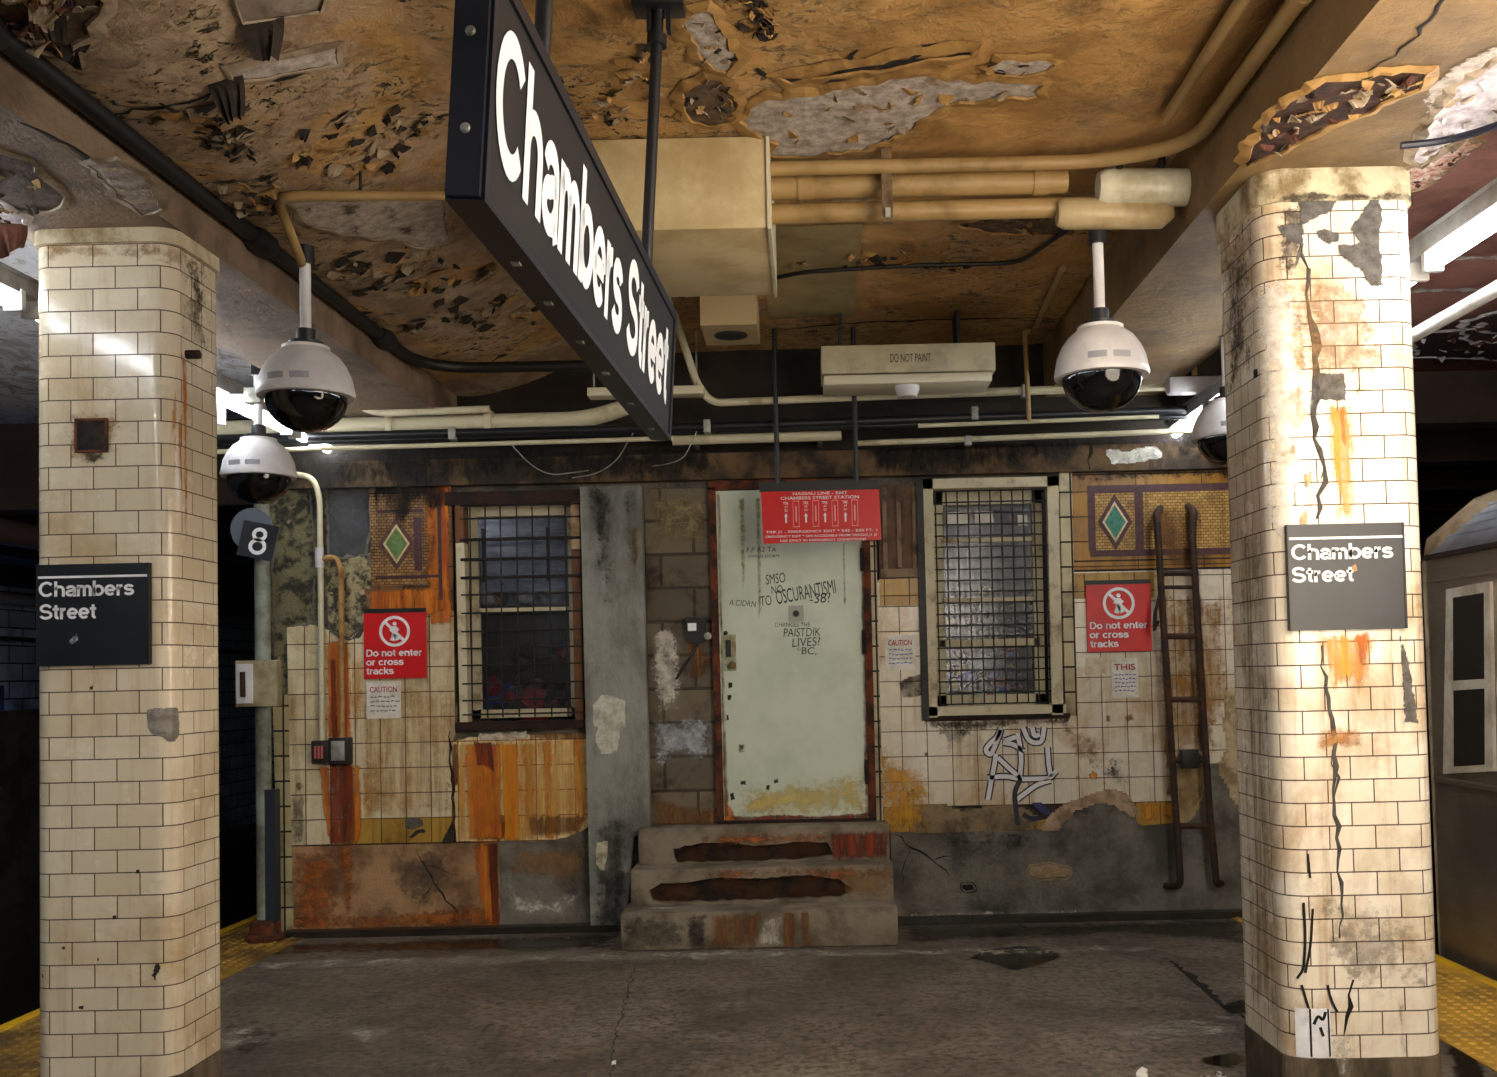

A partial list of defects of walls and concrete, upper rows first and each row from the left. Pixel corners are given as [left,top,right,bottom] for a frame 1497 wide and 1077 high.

spalling [157,0,345,163]
spalling [586,0,1065,161]
peeling [0,148,71,259]
spalling [216,104,538,334]
spalling [1233,47,1497,286]
corrosion [1330,406,1353,512]
spalling [147,707,179,742]
corrosion [294,727,586,929]
crack [1320,645,1344,938]
corrosion [1327,634,1368,685]
corrosion [784,913,809,947]
crack [1343,979,1354,1036]